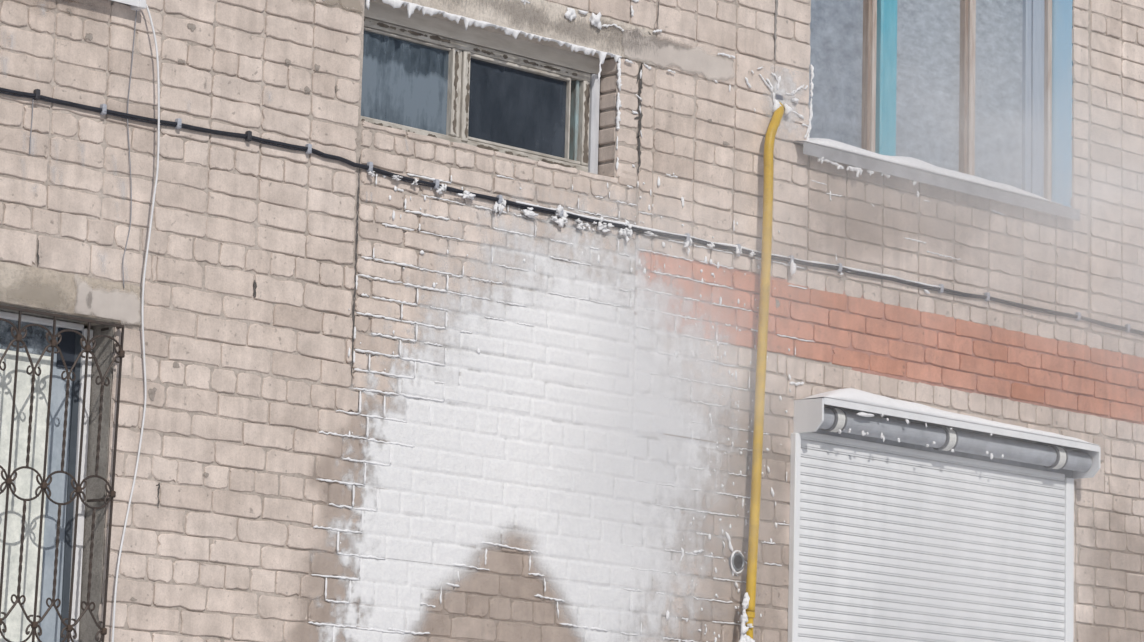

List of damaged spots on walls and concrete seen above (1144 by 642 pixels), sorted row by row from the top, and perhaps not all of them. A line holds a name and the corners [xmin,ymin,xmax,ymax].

crack [634,63,643,173]